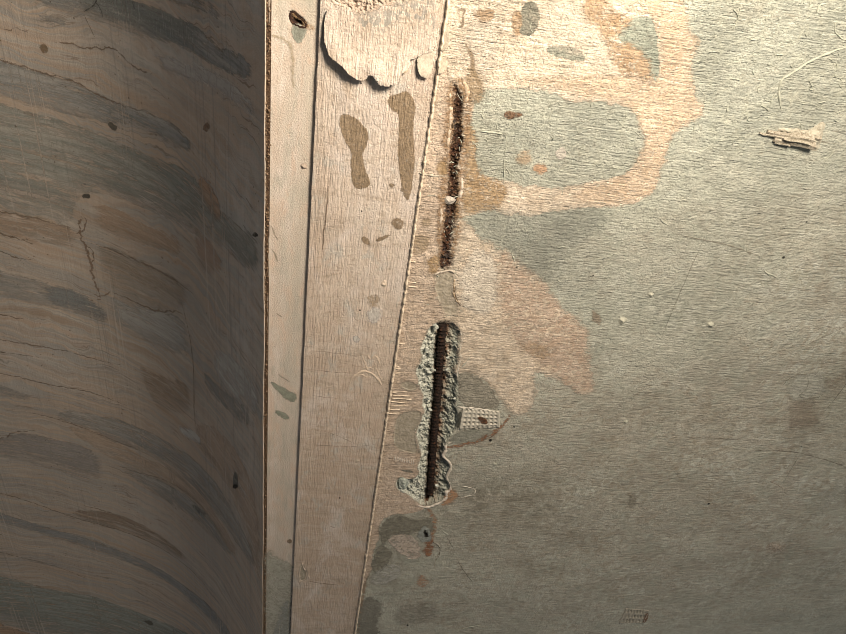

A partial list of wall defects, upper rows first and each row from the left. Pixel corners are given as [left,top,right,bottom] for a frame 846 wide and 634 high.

spalling [289,11,313,29]
peeling [324,0,450,87]
corrosion [427,78,472,273]
spalling [393,319,470,509]